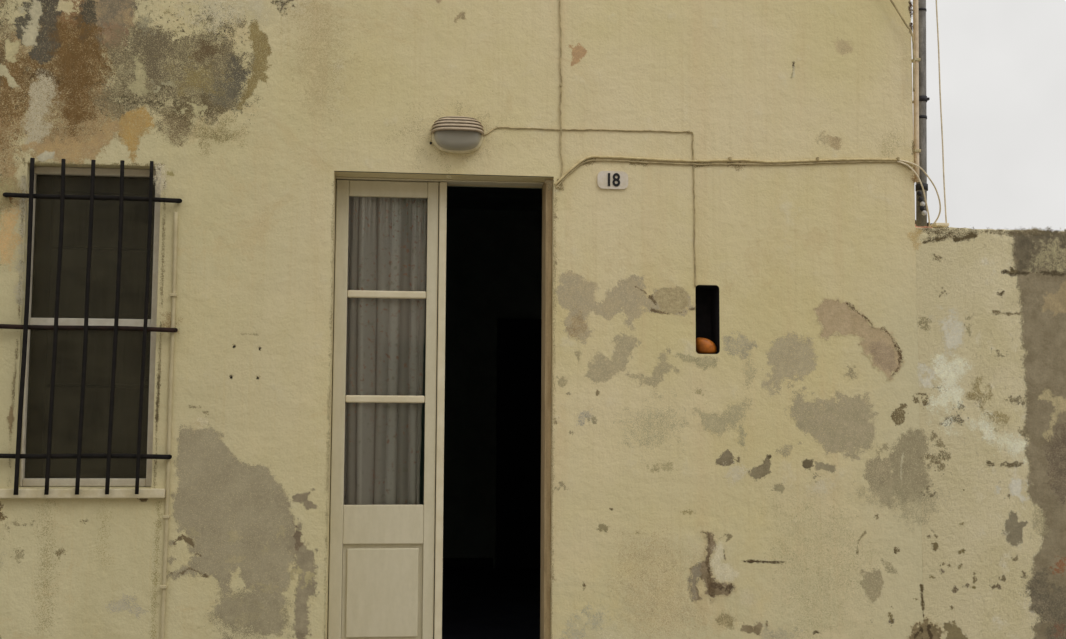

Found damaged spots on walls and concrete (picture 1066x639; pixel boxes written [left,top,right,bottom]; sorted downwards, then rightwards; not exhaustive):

damp [0,0,371,305]
flaking render [166,181,336,639]
peeling [548,190,951,639]